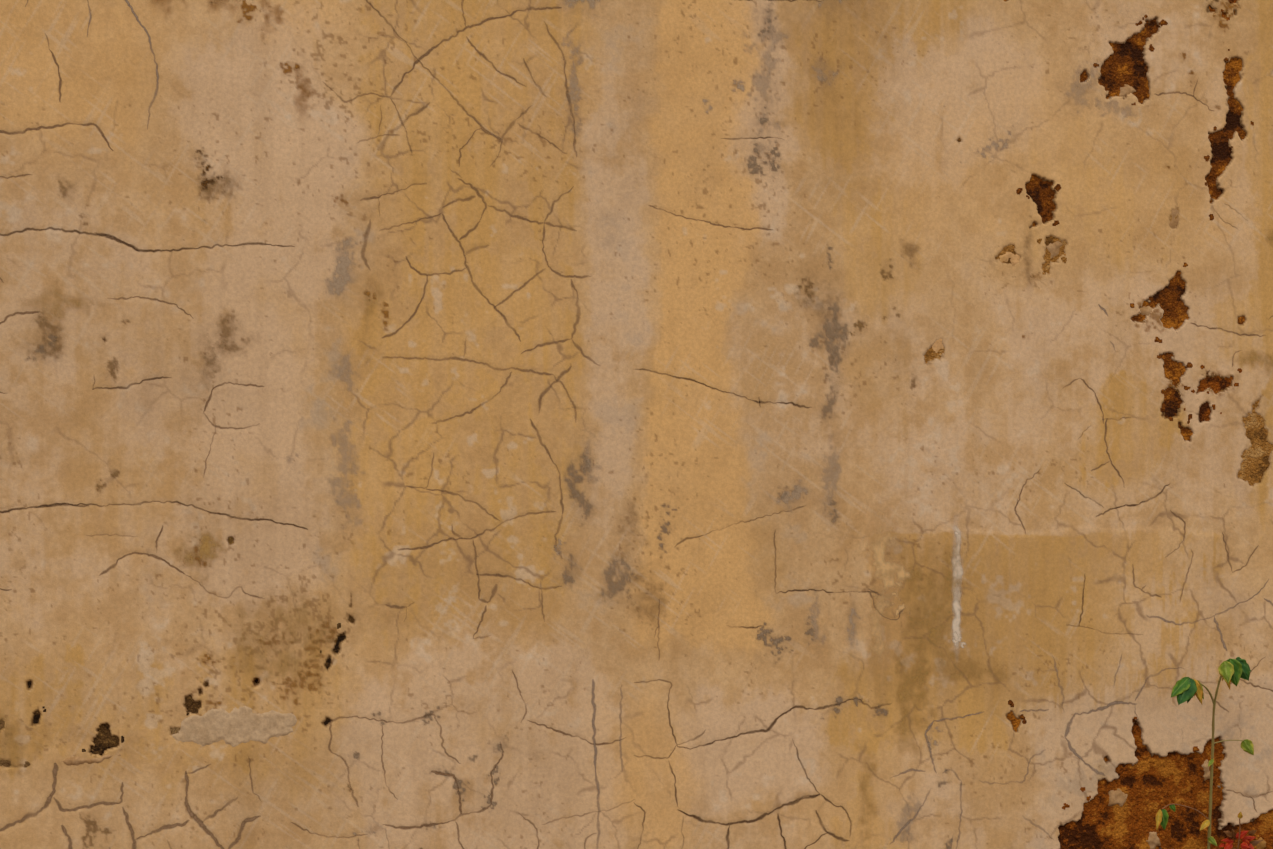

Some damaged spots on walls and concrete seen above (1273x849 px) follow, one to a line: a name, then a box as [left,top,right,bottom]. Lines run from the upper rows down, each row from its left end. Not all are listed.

spalling [1080,15,1168,105]
spalling [1204,49,1254,220]
crack [0,227,294,252]
crack [383,114,590,462]
spalling [1016,175,1067,275]
spalling [1130,262,1242,441]
peeling [1238,396,1273,486]
water stain [847,512,965,656]
crack [0,763,259,849]
crack [329,716,503,849]
crack [667,698,862,849]
spalling [1058,717,1273,849]